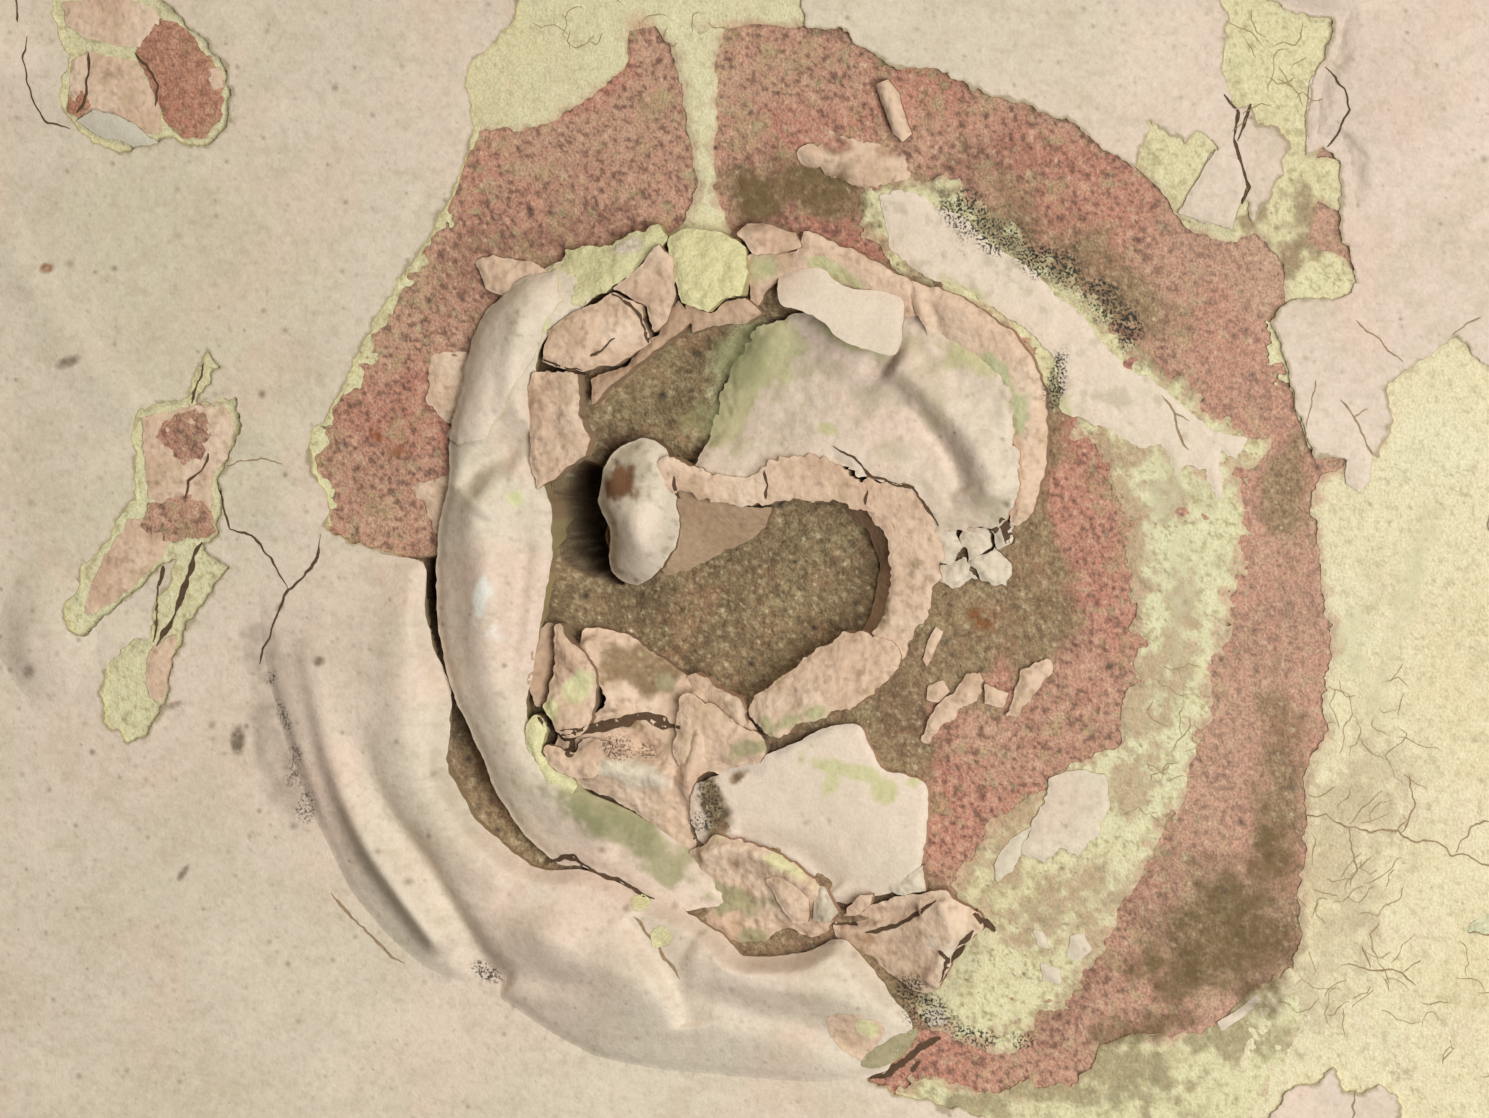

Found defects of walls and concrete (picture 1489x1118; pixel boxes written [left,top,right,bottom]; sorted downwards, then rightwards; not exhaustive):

peeling [52,0,231,153]
peeling [64,352,242,743]
crack [192,364,204,403]
crack [153,453,321,663]
peeling [310,0,1489,1118]
crack [1276,666,1489,1062]